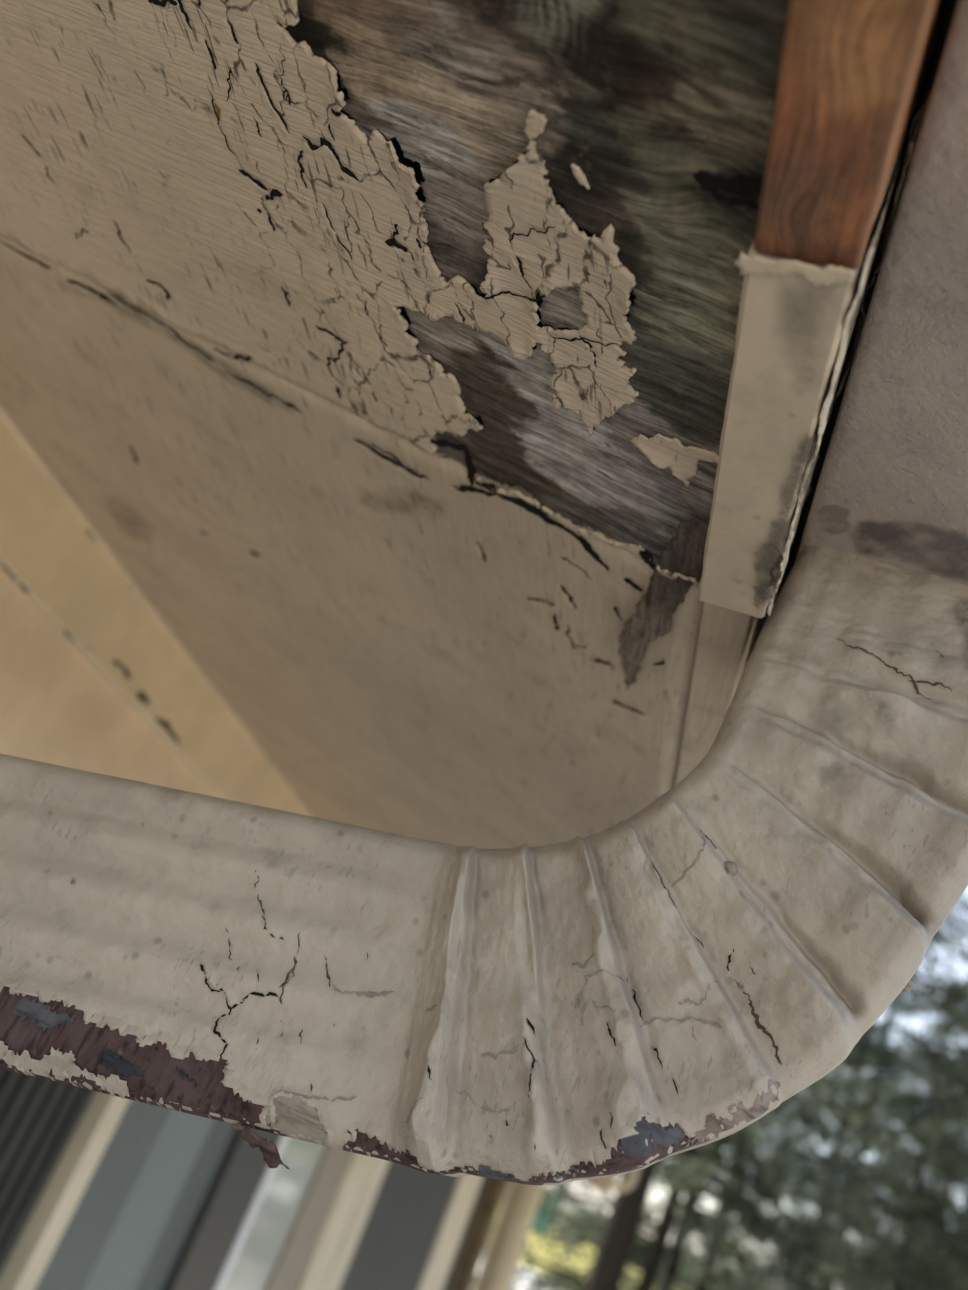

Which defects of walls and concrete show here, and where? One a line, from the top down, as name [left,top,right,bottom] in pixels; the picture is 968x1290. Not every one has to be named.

crack [148,0,359,260]
crack [0,241,302,413]
crack [314,296,392,401]
crack [385,224,422,262]
peeling [277,0,931,616]
crack [528,556,609,665]
crack [838,639,952,699]
crack [652,829,717,908]
crack [197,870,397,1058]
peeling [0,978,780,1185]
crack [600,1112,613,1149]
crack [571,938,782,1094]